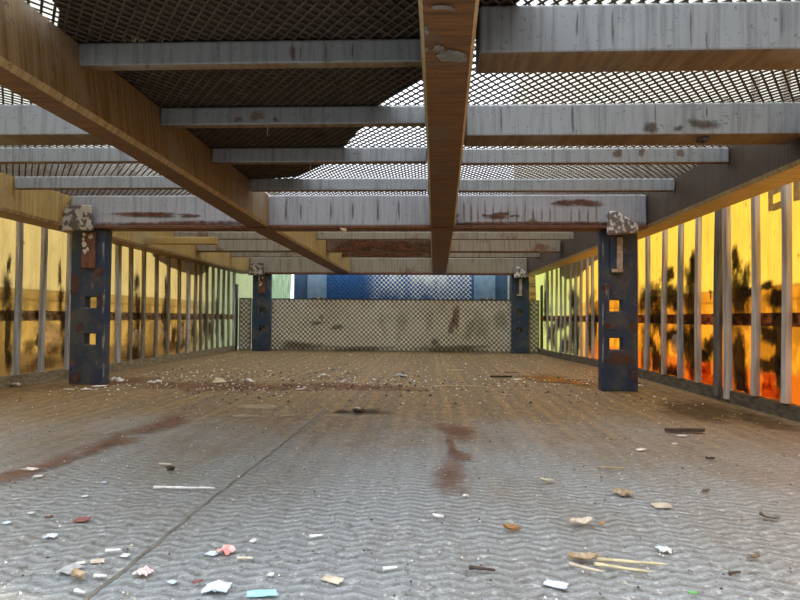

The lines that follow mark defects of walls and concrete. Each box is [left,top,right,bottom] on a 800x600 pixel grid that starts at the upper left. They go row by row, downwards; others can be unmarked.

peeling [424,45,466,63]
rust [96,212,241,225]
rust [456,199,607,225]
rust [335,240,426,257]
rust [70,275,79,294]